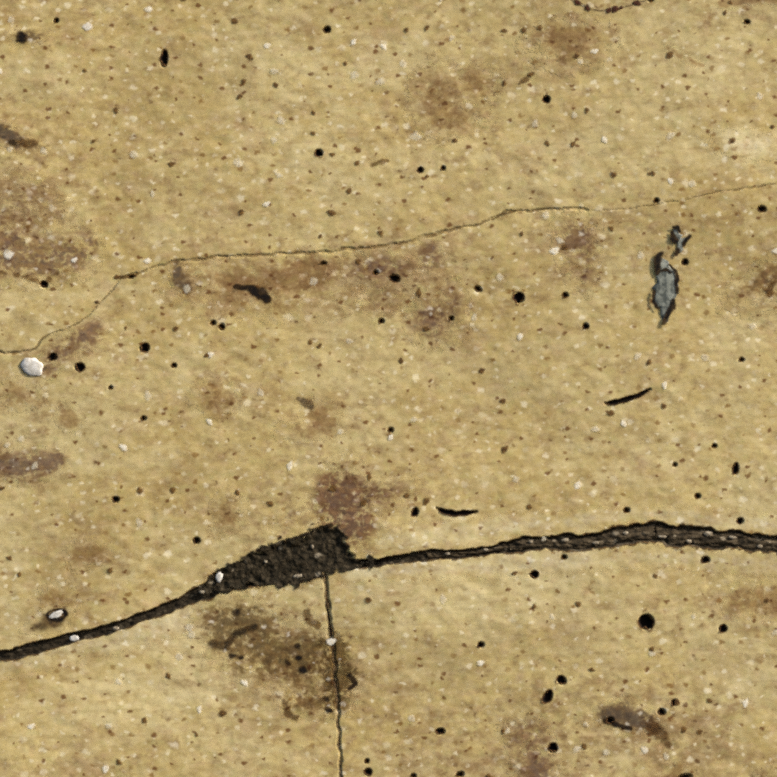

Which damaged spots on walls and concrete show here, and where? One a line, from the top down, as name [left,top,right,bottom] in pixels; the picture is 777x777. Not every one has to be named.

crack [572,0,648,13]
leakage [716,0,777,10]
crack [340,207,569,250]
crack [249,250,312,258]
crack [119,269,146,279]
crack [0,572,260,683]
crack [323,506,777,777]